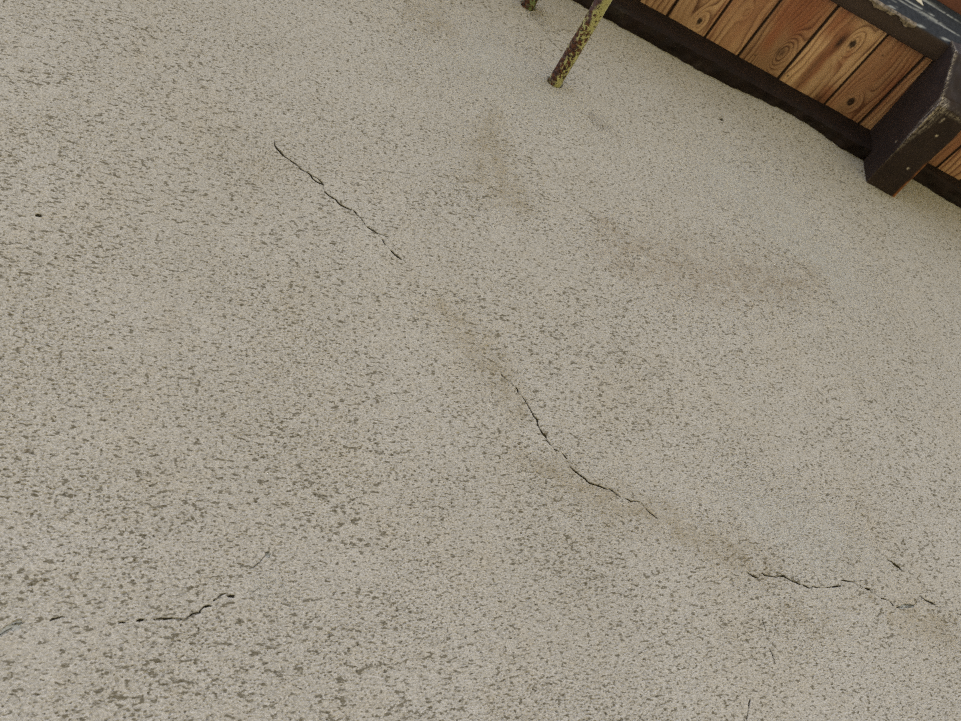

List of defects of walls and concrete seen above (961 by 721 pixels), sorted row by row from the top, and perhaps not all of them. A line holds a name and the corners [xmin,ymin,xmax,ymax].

crack [274,143,402,260]
crack [501,374,657,519]
crack [119,593,234,624]
crack [748,573,935,609]
crack [0,620,22,636]